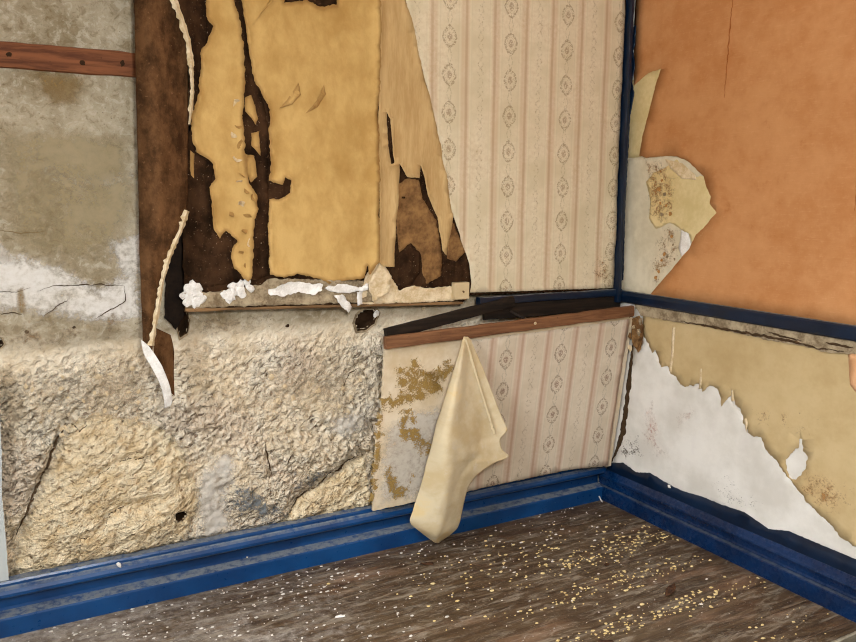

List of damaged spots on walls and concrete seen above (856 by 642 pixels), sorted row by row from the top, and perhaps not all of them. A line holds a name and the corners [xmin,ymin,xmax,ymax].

crack [0,283,126,319]
damp [0,137,140,324]
peeling [176,0,273,340]
peeling [268,243,471,334]
peeling [622,156,716,294]
crack [16,421,93,535]
spalling [14,391,198,575]
spalling [281,456,371,522]
damp [367,358,454,504]
peeling [613,316,856,559]